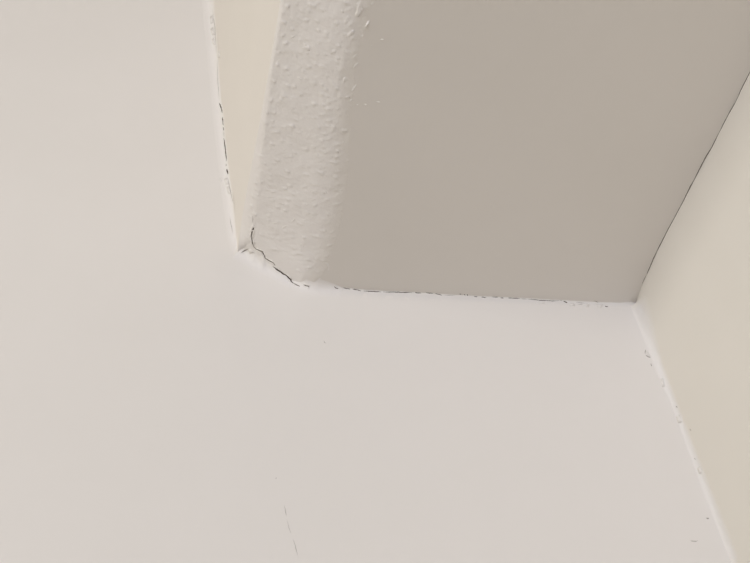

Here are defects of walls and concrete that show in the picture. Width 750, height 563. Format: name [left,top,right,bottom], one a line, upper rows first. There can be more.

crack [243,225,310,288]
crack [335,287,608,308]